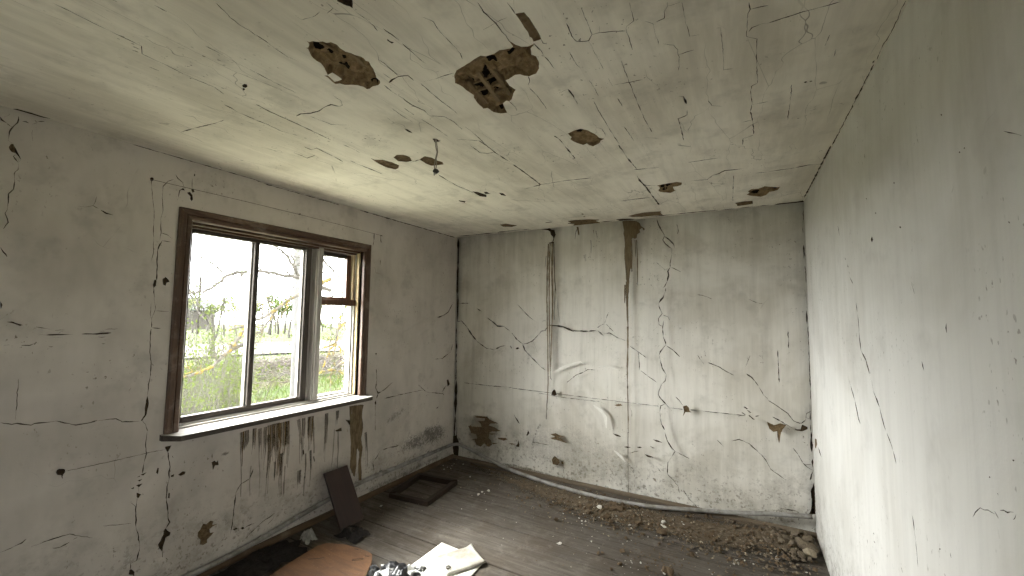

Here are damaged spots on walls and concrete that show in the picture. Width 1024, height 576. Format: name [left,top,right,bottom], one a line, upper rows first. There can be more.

flaking render [307,41,380,89]
flaking render [454,4,547,113]
flaking render [371,155,443,169]
flaking render [561,128,606,146]
flaking render [736,186,804,206]
crack [359,1,906,514]
crack [3,145,338,570]
leakage [545,244,559,419]
leakage [622,220,645,461]
leakage [241,405,368,494]
flaking render [468,416,529,447]
flaking render [744,407,817,448]